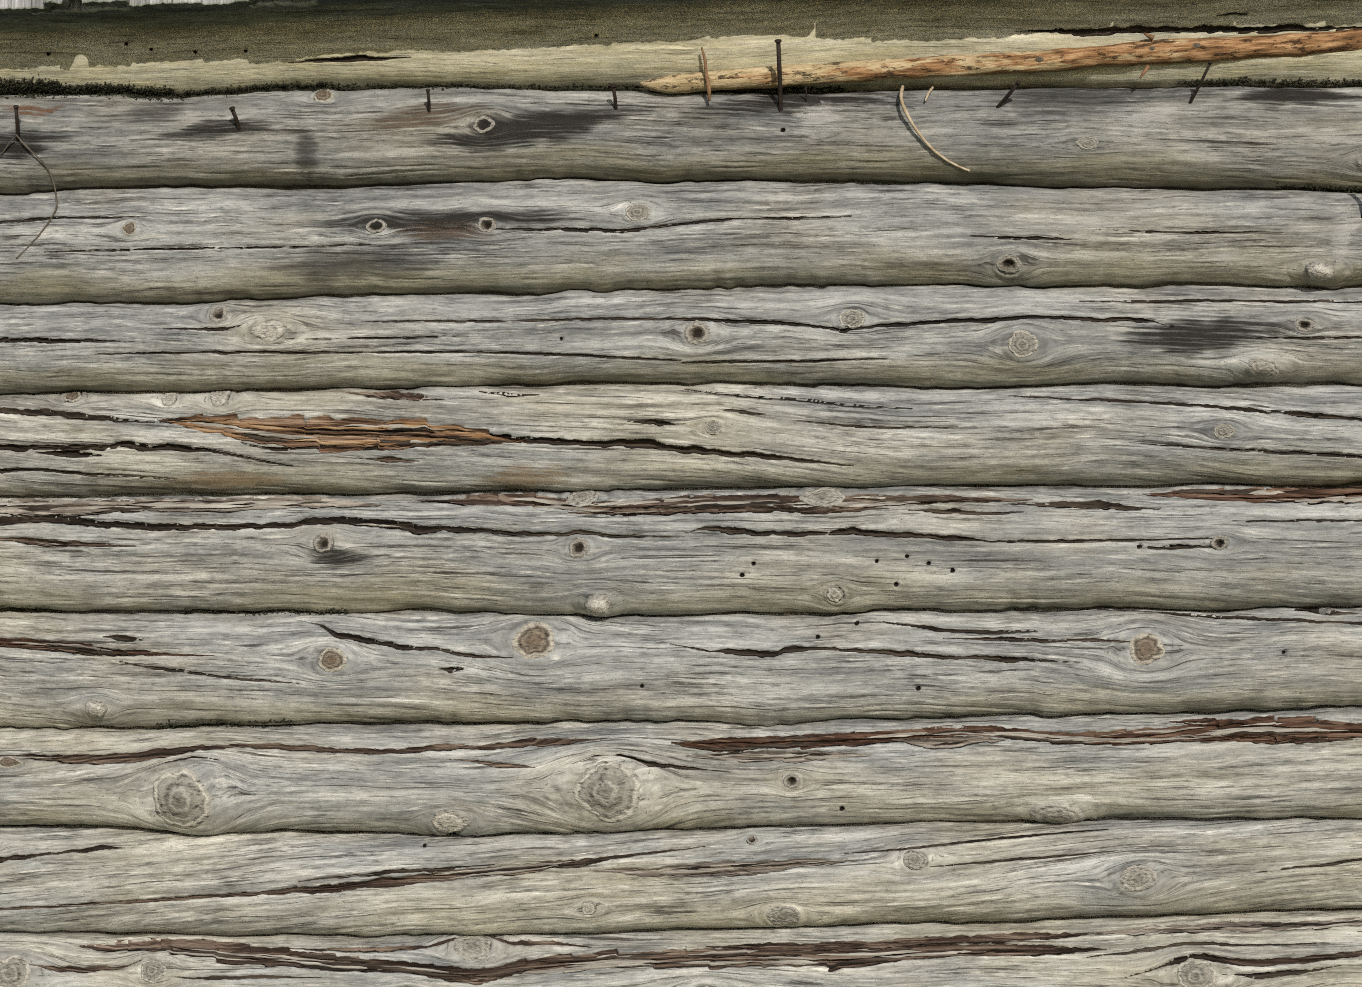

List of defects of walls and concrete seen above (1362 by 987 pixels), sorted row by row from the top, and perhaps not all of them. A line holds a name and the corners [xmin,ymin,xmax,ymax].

damp [373,103,654,152]
crack [0,299,1362,429]
crack [0,407,854,481]
crack [1139,443,1362,458]
crack [0,500,1362,549]
crack [30,960,141,973]
crack [172,935,592,980]